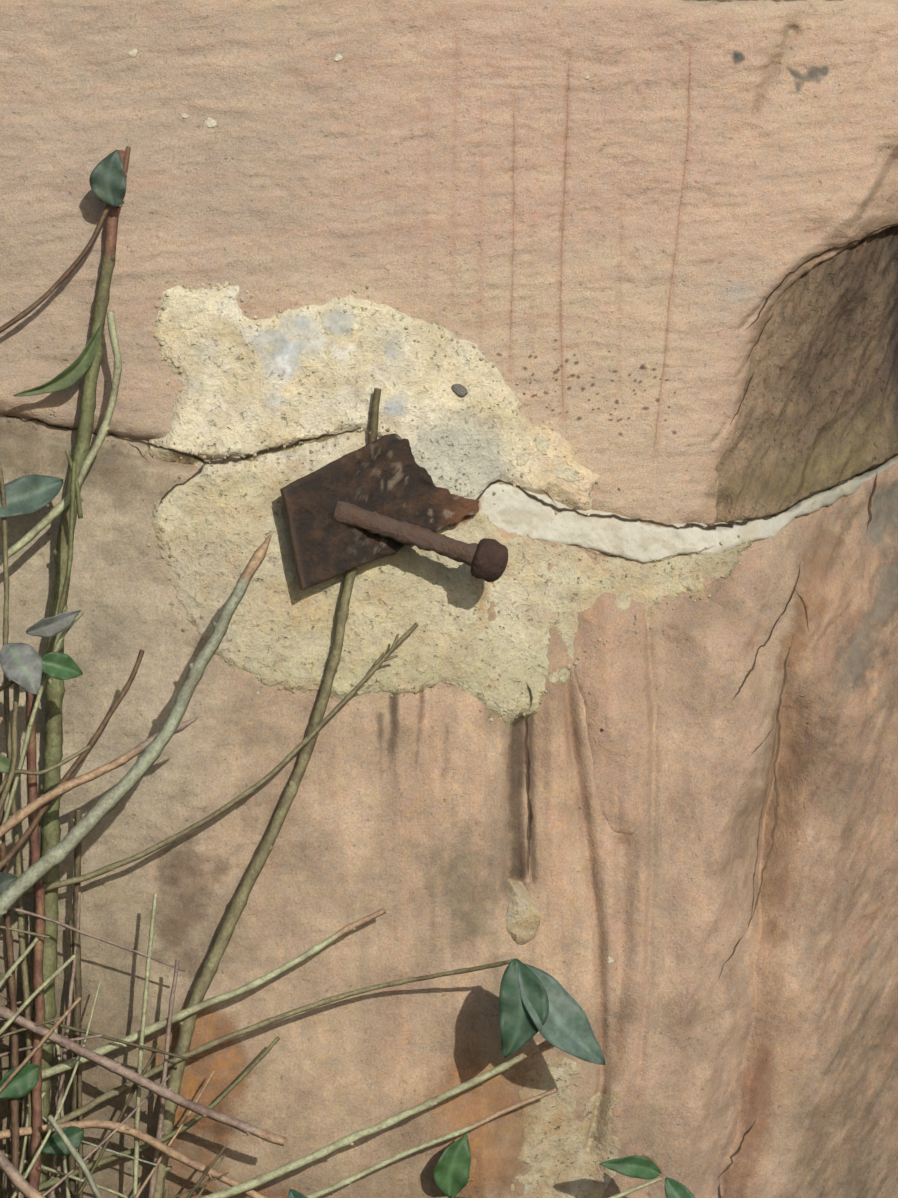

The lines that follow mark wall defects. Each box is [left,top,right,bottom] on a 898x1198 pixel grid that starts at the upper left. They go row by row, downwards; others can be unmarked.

crack [0,415,359,506]
peeling [146,226,898,727]
crack [476,454,898,563]
damp [379,694,397,746]
damp [510,715,527,878]
crack [720,570,809,976]
crack [718,1122,755,1198]